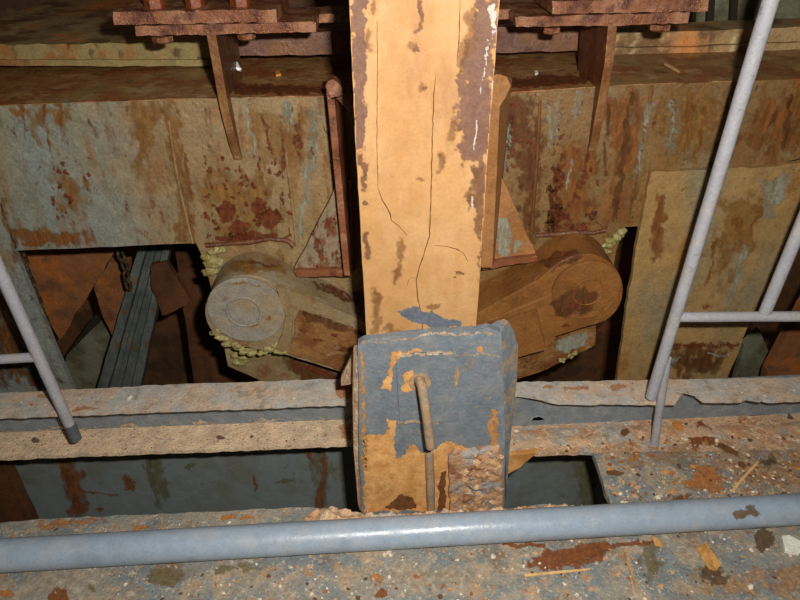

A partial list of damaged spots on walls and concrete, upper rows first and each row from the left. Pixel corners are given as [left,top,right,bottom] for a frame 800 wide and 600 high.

crack [373,28,381,100]
corrosion [0,198,96,249]
corrosion [132,102,316,243]
crack [377,153,407,235]
crack [407,77,468,329]
peeling [453,0,499,240]
corrosion [506,73,643,239]
corrosion [650,195,668,261]
peeling [360,348,469,513]
peeling [487,409,499,446]
corrosion [39,458,118,529]
corrosion [501,539,654,571]